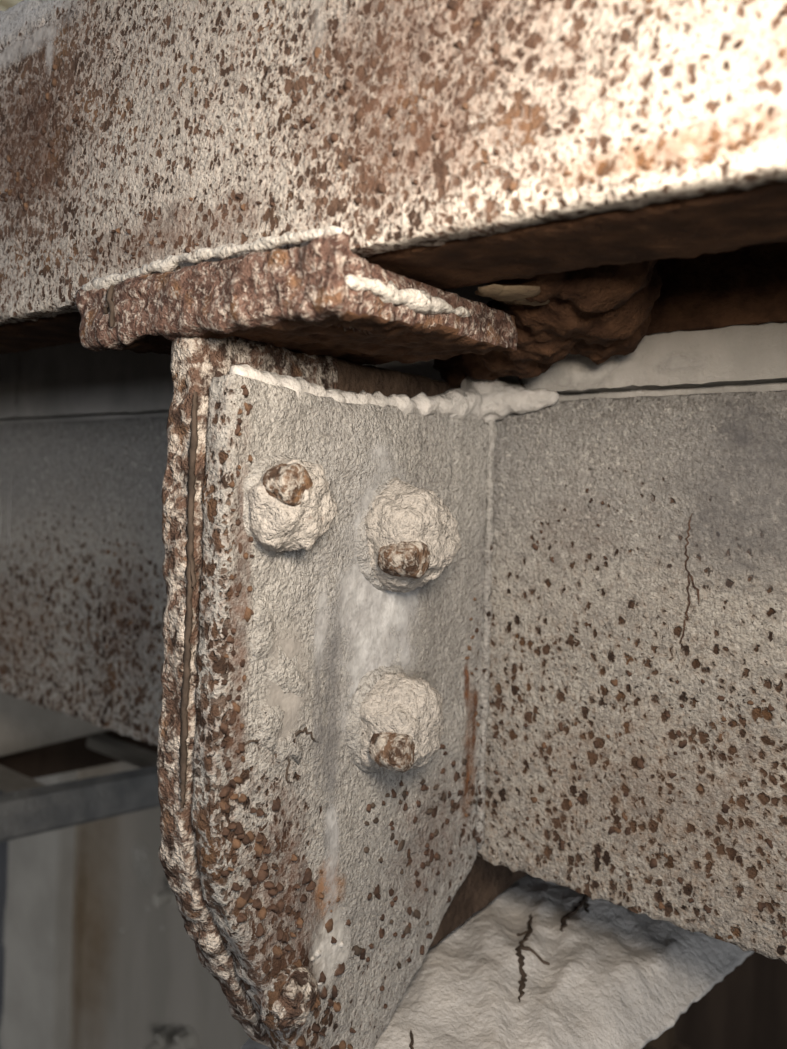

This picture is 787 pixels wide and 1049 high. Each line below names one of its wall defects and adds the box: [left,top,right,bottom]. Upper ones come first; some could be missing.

corrosion [447,0,460,11]
corrosion [482,40,501,74]
corrosion [635,138,666,171]
corrosion [709,122,758,151]
damp [523,356,615,388]
corrosion [235,384,253,436]
crack [680,513,700,650]
corrosion [220,574,254,770]
crack [560,894,590,932]
damp [310,908,345,986]
crack [515,913,550,1003]
crack [407,1030,415,1049]